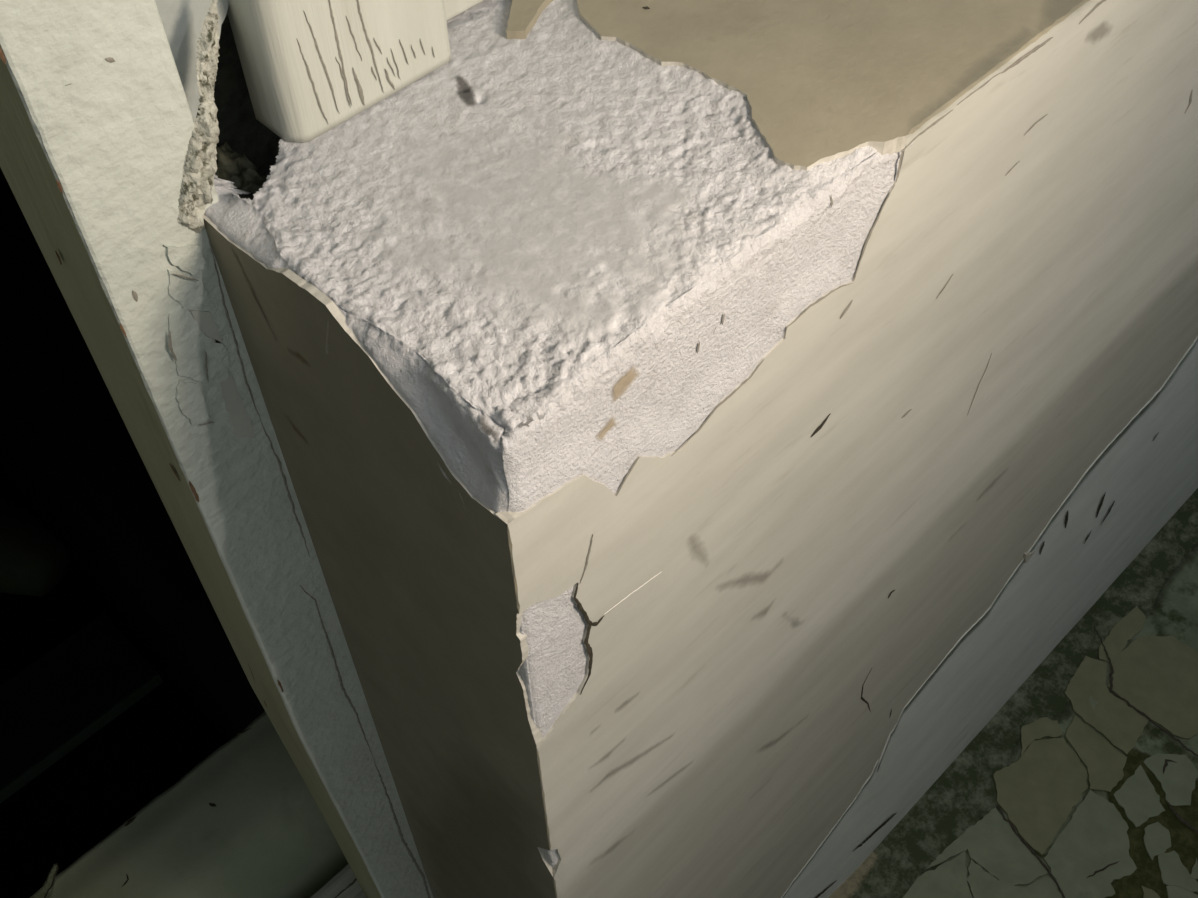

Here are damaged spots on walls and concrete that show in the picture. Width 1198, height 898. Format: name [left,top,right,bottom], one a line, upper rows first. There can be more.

crack [206,231,311,558]
flaking render [204,0,913,513]
crack [299,585,431,898]
flaking render [519,585,587,738]
crack [574,535,604,695]
crack [861,670,892,718]
peeling [781,336,1198,898]
crack [903,606,1198,898]